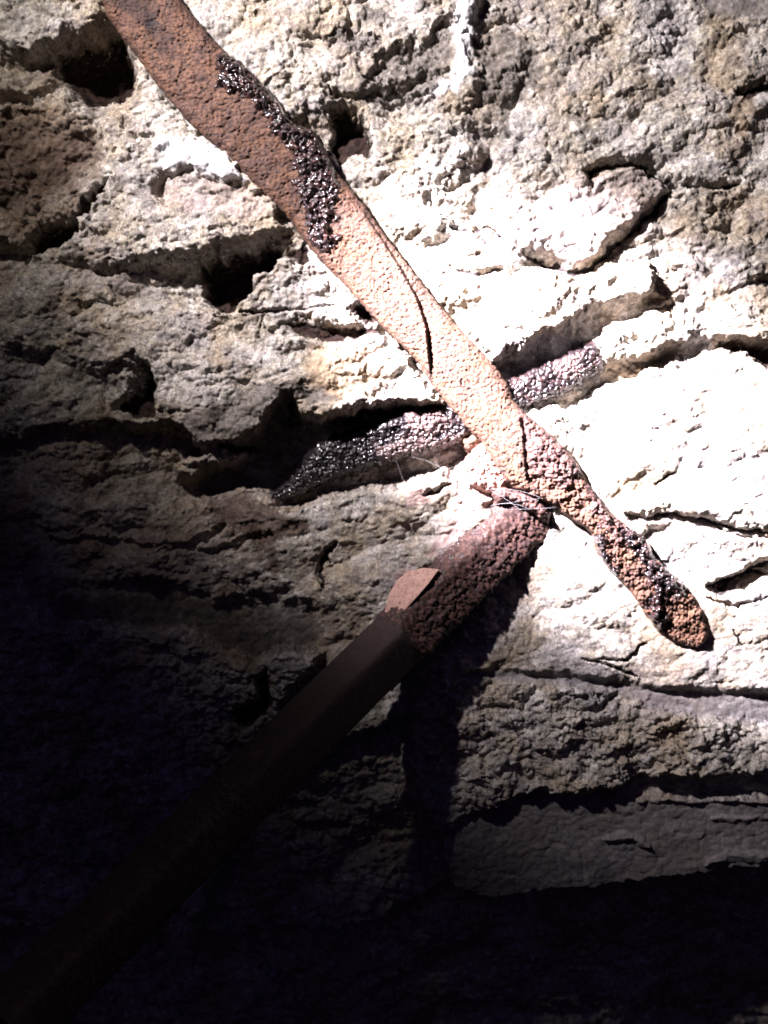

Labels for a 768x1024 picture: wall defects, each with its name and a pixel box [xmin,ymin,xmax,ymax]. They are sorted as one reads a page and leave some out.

rust [553,352,586,379]
rust [372,405,481,464]
rust [210,494,308,573]
rust [429,470,493,554]